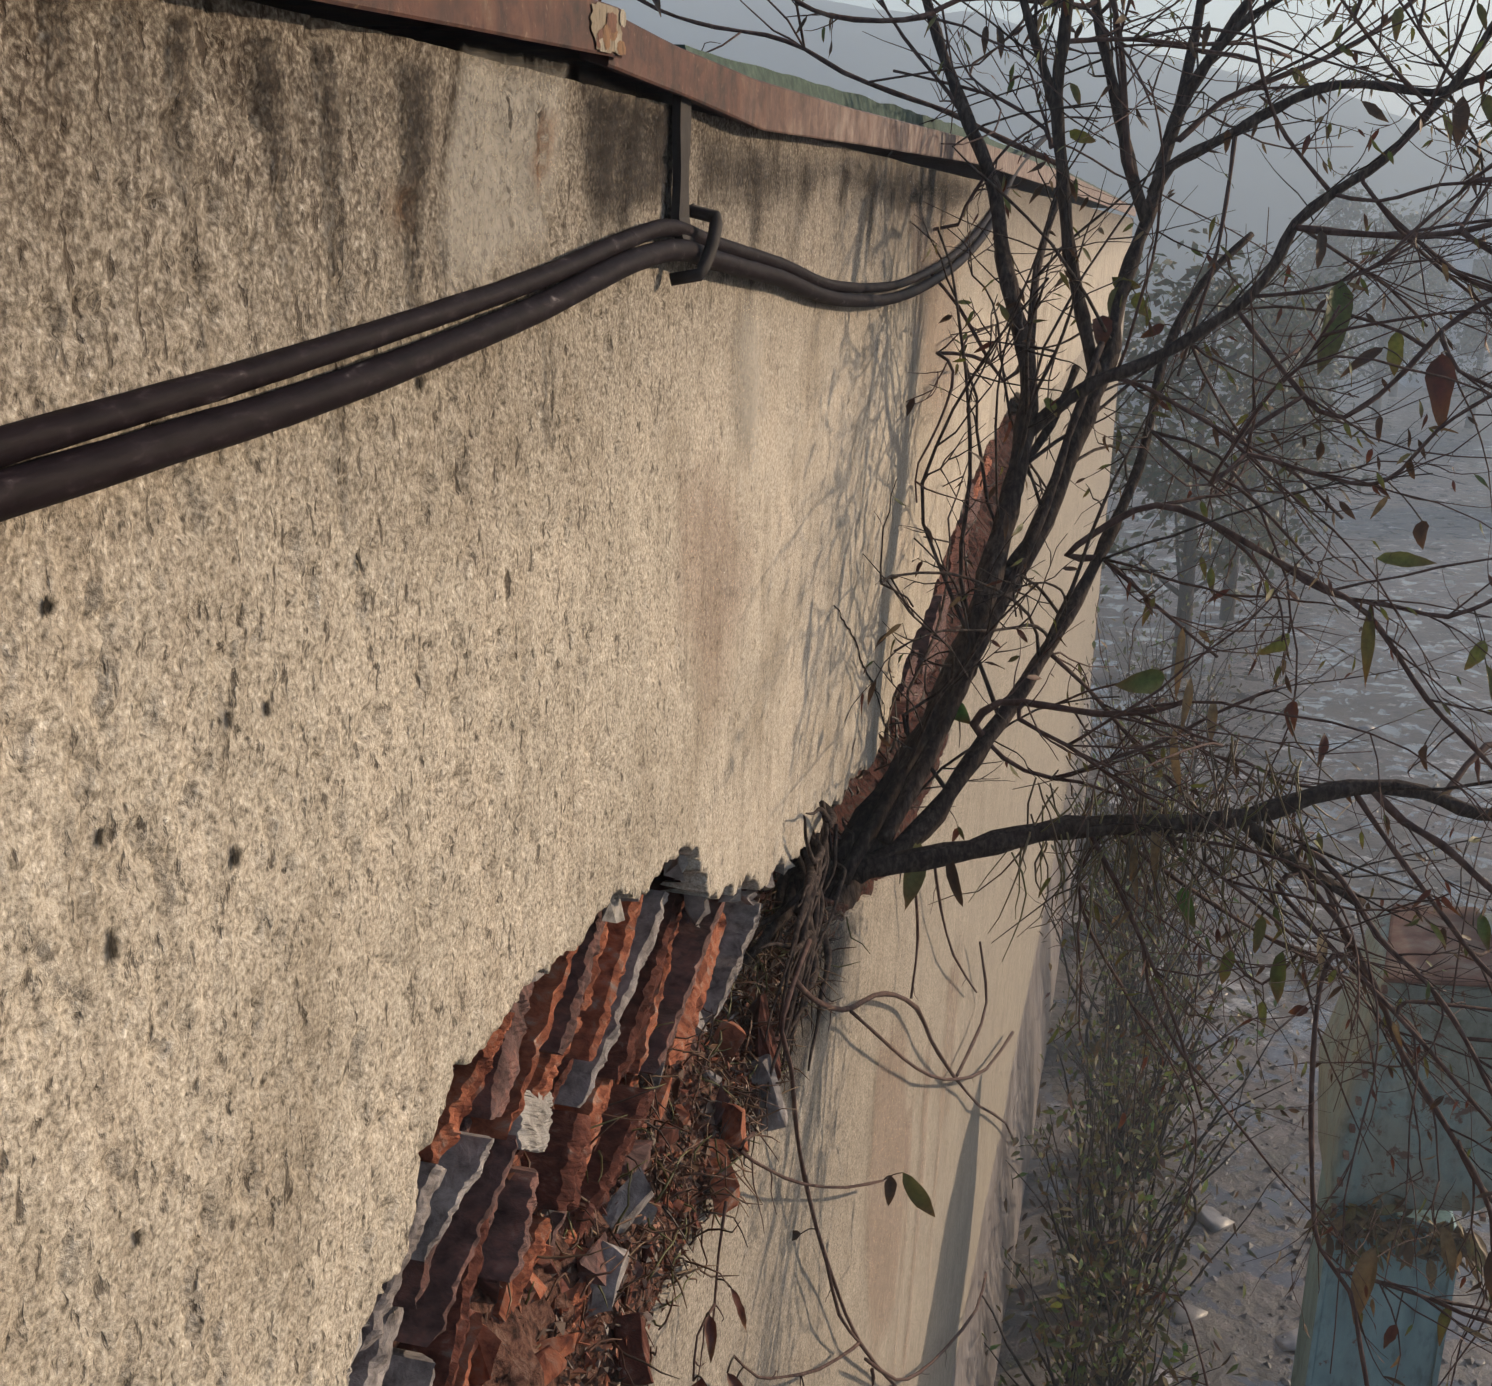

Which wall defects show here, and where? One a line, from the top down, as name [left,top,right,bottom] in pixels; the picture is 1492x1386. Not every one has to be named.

damp [173,19,192,169]
damp [257,34,291,237]
damp [314,47,346,330]
damp [399,64,433,307]
damp [448,65,560,272]
damp [588,93,670,229]
damp [706,141,816,247]
spalling [232,845,242,867]
spalling [346,854,798,1386]